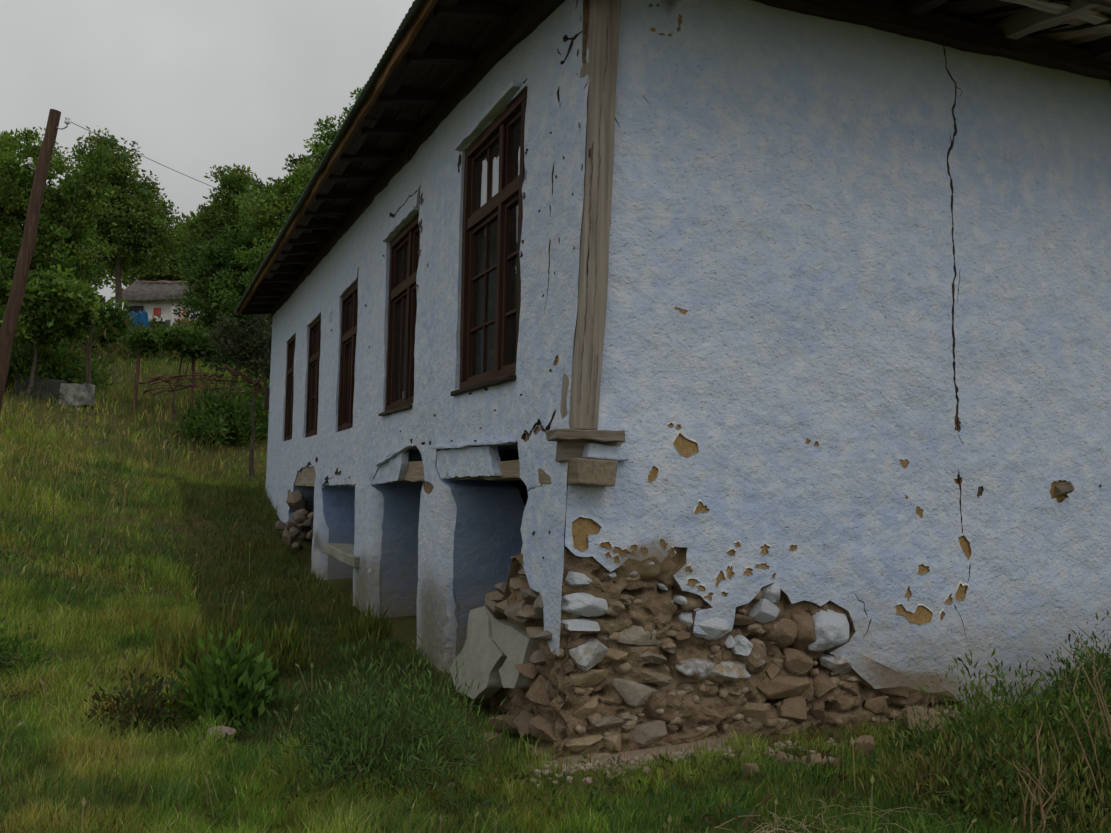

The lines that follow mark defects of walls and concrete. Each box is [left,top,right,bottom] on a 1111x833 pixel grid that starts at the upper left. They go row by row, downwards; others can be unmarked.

crack [557,0,591,106]
crack [389,190,418,218]
crack [544,164,560,311]
crack [943,46,964,534]
crack [521,410,556,439]
peeling [666,422,699,458]
flaking render [1050,480,1069,503]
peeling [958,535,971,560]
spalling [450,516,969,760]
crack [954,566,972,676]